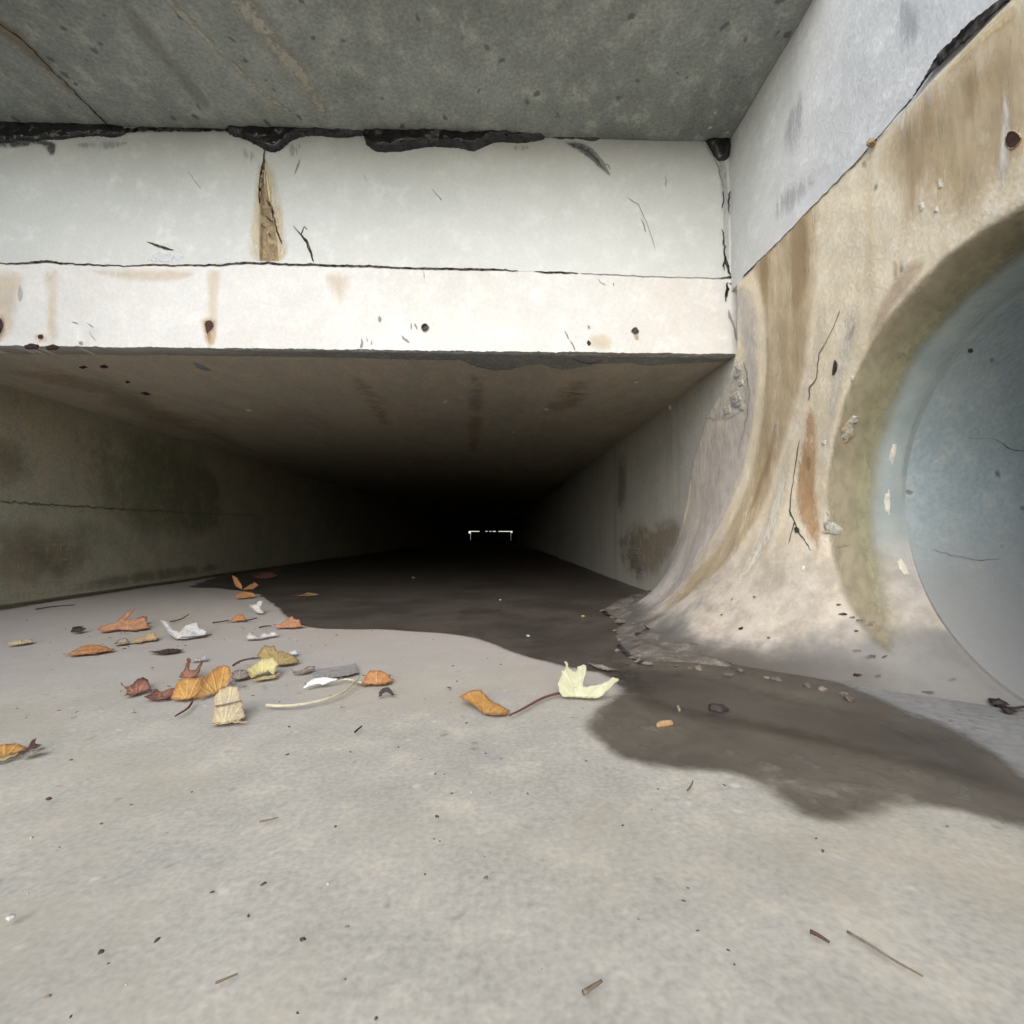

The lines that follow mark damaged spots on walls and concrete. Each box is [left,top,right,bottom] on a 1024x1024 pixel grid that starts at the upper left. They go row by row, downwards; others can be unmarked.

corrosion [927,33,1024,192]
spalling [259,164,282,261]
crack [0,0,1010,451]
corrosion [676,214,812,602]
crack [788,443,812,551]
corrosion [798,413,818,541]
water stain [191,547,1024,822]